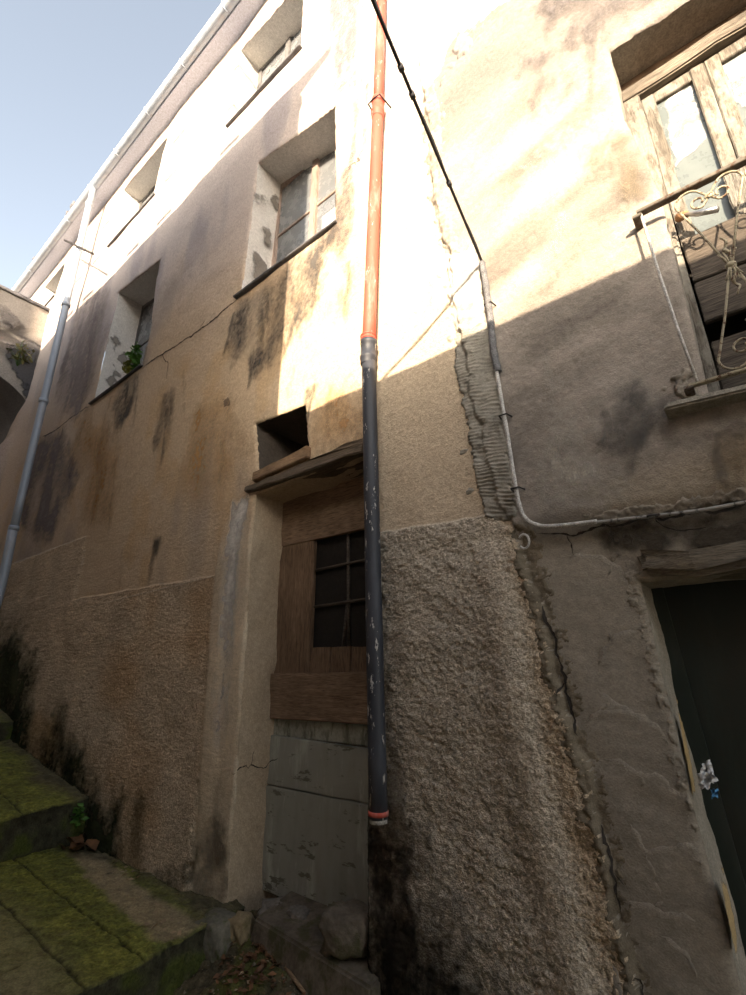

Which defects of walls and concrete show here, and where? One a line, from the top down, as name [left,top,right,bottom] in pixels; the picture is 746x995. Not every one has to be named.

water stain [327,0,363,87]
peeling [411,0,509,256]
water stain [231,167,354,377]
crack [143,300,236,378]
water stain [21,434,78,537]
crack [542,606,577,735]
water stain [0,637,123,859]
water stain [367,809,481,995]
crack [601,825,625,912]